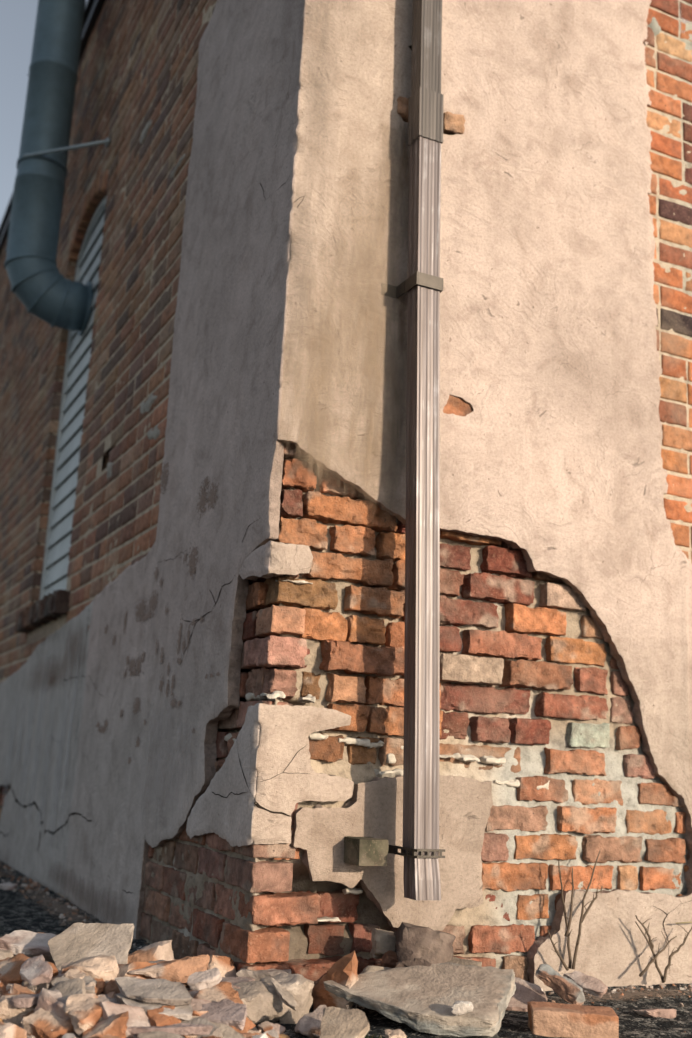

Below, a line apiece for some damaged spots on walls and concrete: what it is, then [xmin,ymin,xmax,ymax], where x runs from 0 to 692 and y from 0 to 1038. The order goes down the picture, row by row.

crack [183,581,232,655]
crack [212,736,313,816]
spalling [0,442,690,1038]
crack [12,790,93,852]